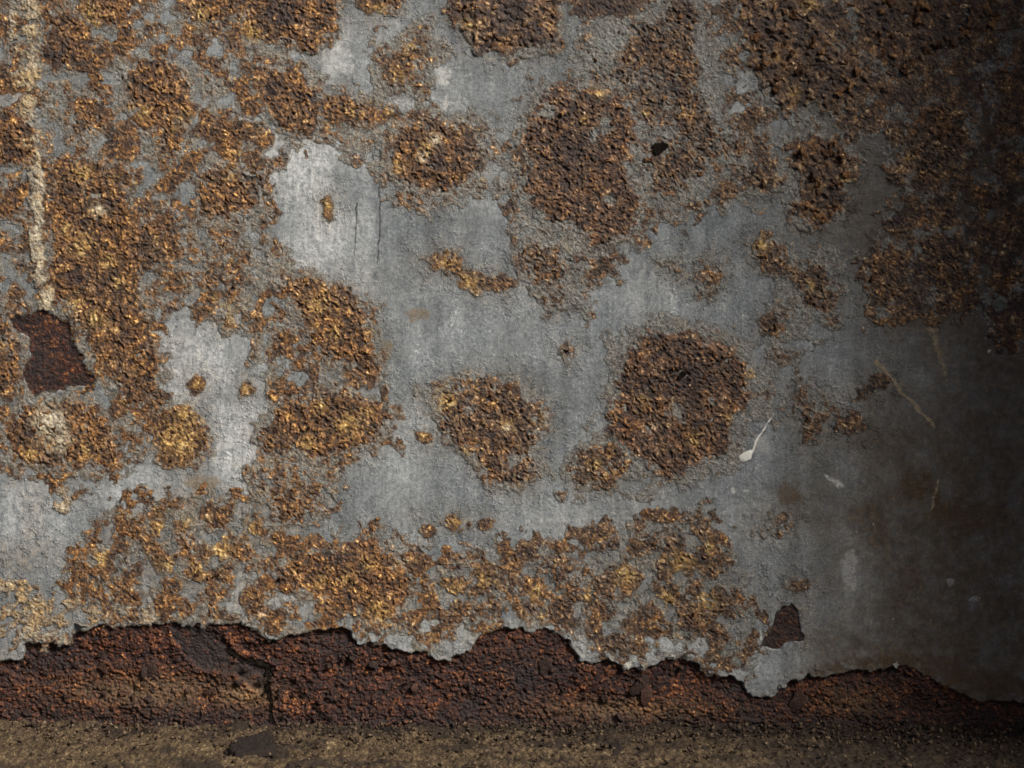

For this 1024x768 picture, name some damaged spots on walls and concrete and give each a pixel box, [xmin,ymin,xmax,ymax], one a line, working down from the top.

corrosion [419,0,1006,320]
peeling [9,307,96,398]
corrosion [0,0,757,652]
corrosion [755,312,785,336]
peeling [0,617,1024,731]
peeling [760,604,804,649]